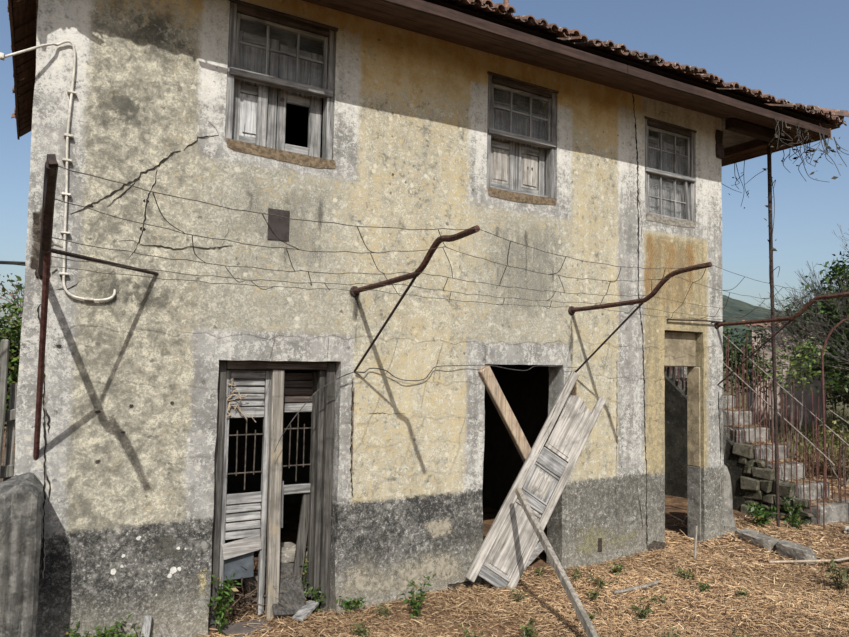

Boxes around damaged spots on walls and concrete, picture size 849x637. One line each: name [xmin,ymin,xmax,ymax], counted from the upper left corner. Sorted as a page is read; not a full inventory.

crack [71,121,230,256]
crack [615,93,648,549]